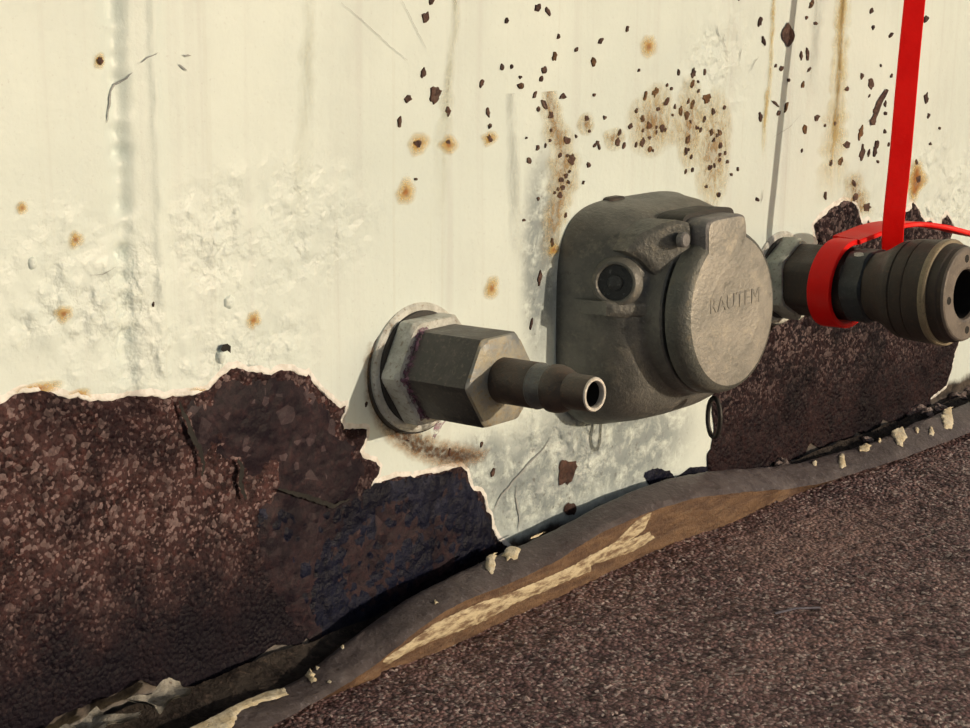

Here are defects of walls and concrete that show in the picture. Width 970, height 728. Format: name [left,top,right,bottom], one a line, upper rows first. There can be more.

corrosion [400,183,412,199]
peeling [500,52,601,198]
corrosion [547,91,573,232]
peeling [615,68,739,176]
corrosion [832,0,847,158]
peeling [812,180,873,245]
peeling [852,236,882,249]
corrosion [909,165,925,198]
peeling [903,199,954,242]
corrosion [376,415,483,464]
peeling [644,316,960,485]
peeling [0,361,511,728]